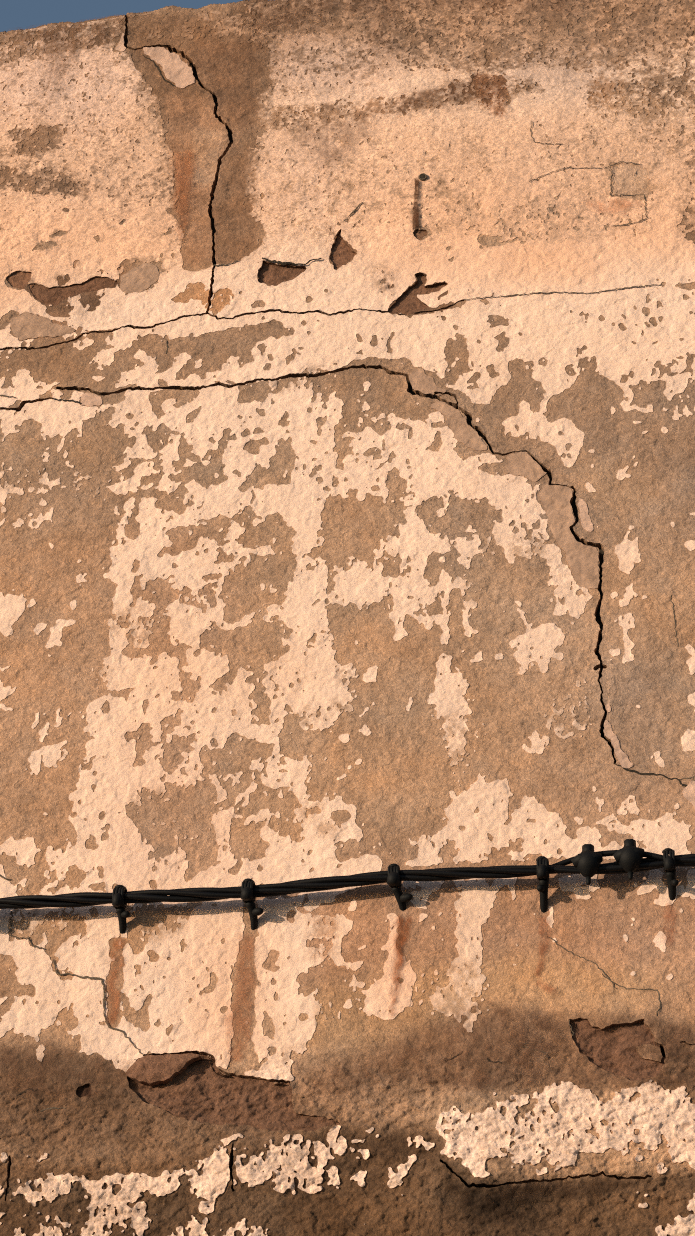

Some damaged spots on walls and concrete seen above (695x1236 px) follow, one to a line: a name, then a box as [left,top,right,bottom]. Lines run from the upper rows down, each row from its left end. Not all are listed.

crack [125,22,321,306]
crack [464,284,662,300]
peeling [0,0,695,898]
crack [407,380,493,454]
crack [542,469,694,787]
crack [8,911,142,1054]
rust [394,916,410,985]
peeling [429,877,517,1032]
peeling [634,868,695,913]
peeling [0,886,425,1236]
peeling [383,1019,695,1196]
peeling [655,1193,695,1236]